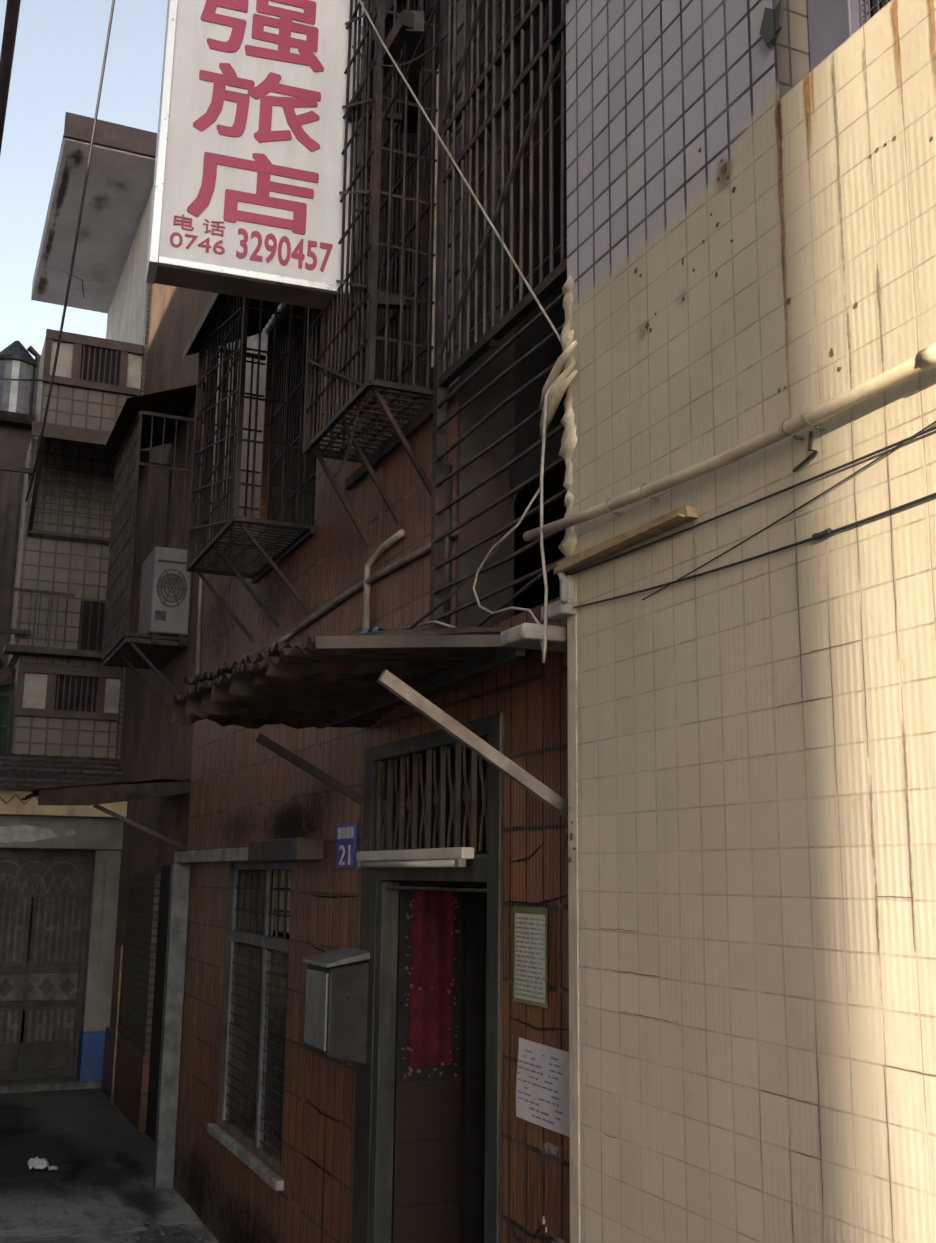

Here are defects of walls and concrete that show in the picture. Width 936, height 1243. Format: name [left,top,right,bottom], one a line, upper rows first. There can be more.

corrosion [804,72,814,133]
corrosion [891,0,899,68]
corrosion [775,103,786,322]
crack [875,811,915,954]
crack [609,969,667,978]
crack [759,1029,824,1243]
crack [884,1065,936,1243]